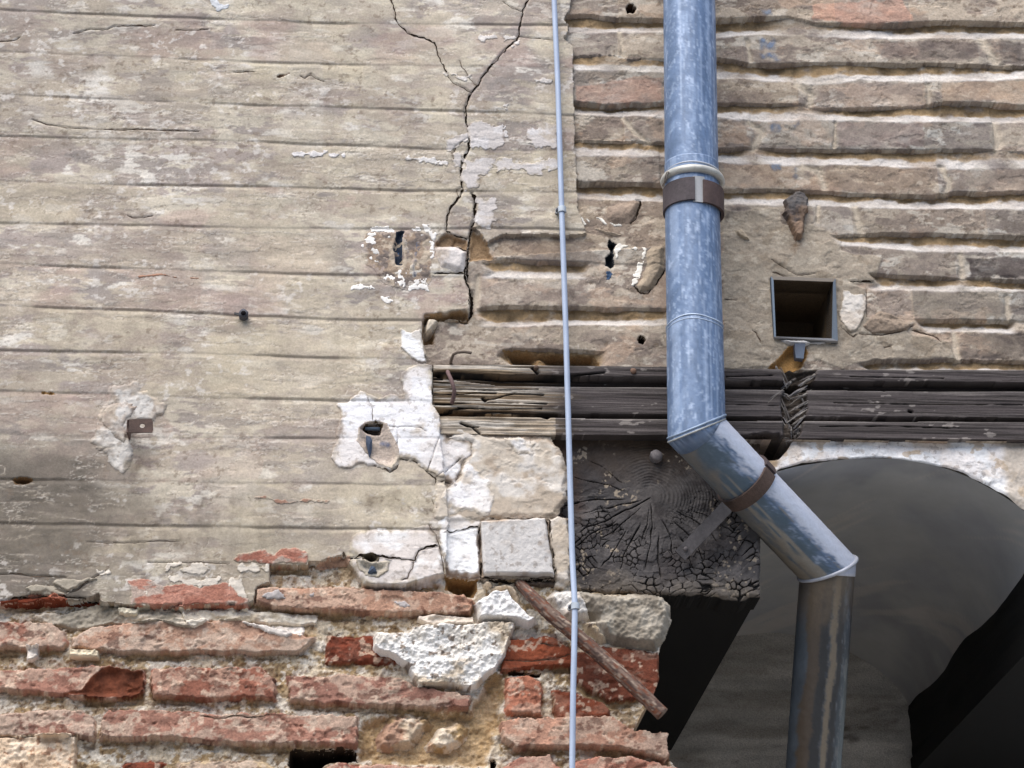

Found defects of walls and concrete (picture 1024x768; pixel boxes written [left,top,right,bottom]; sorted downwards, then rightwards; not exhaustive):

peeling [291,150,345,158]
peeling [360,120,558,290]
crack [390,0,550,324]
peeling [0,548,350,637]